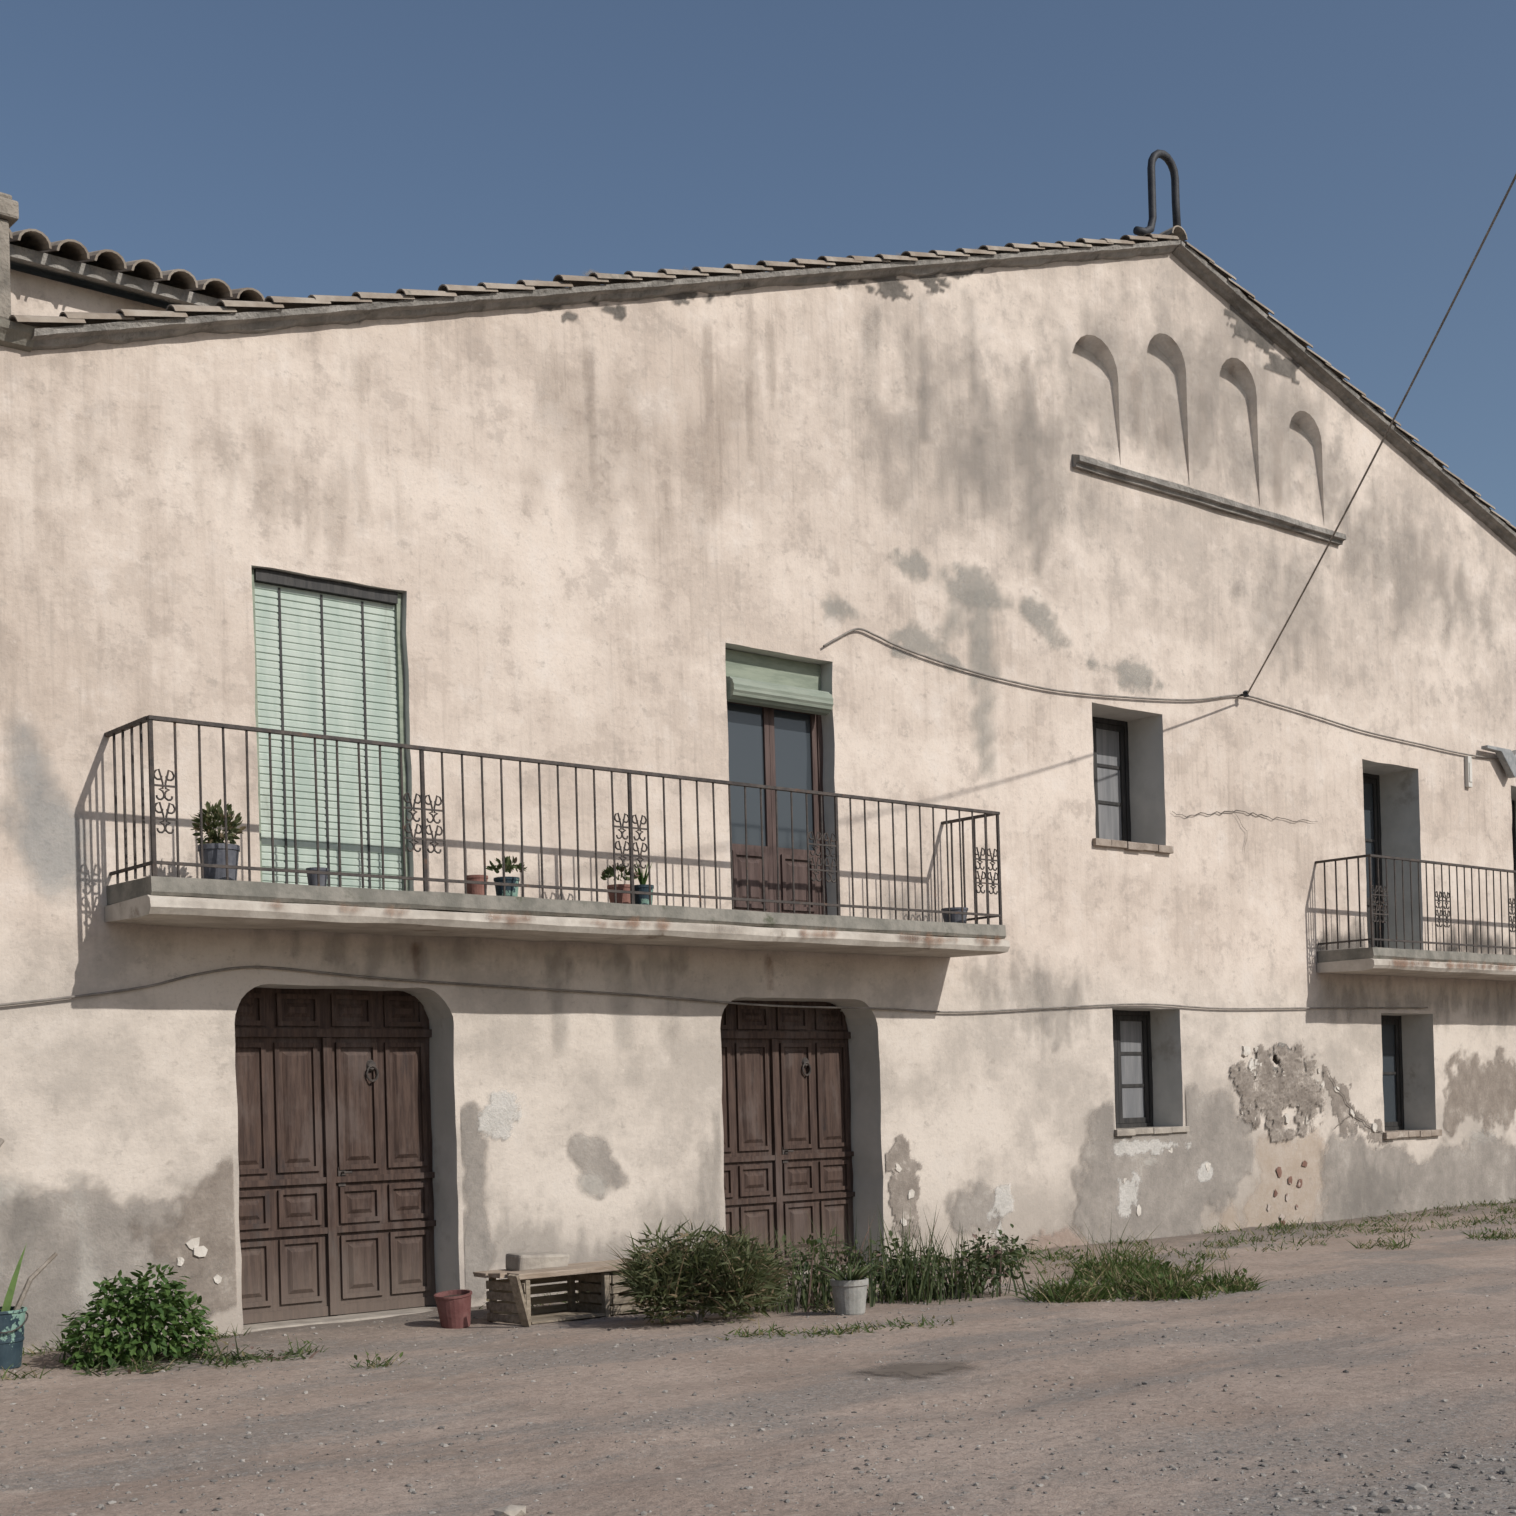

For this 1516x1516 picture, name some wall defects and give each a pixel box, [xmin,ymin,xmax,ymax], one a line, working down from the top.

spalling [1230,1042,1388,1150]
flaking render [1444,1047,1516,1136]
peeling [569,1134,627,1193]
flaking render [886,1134,922,1239]